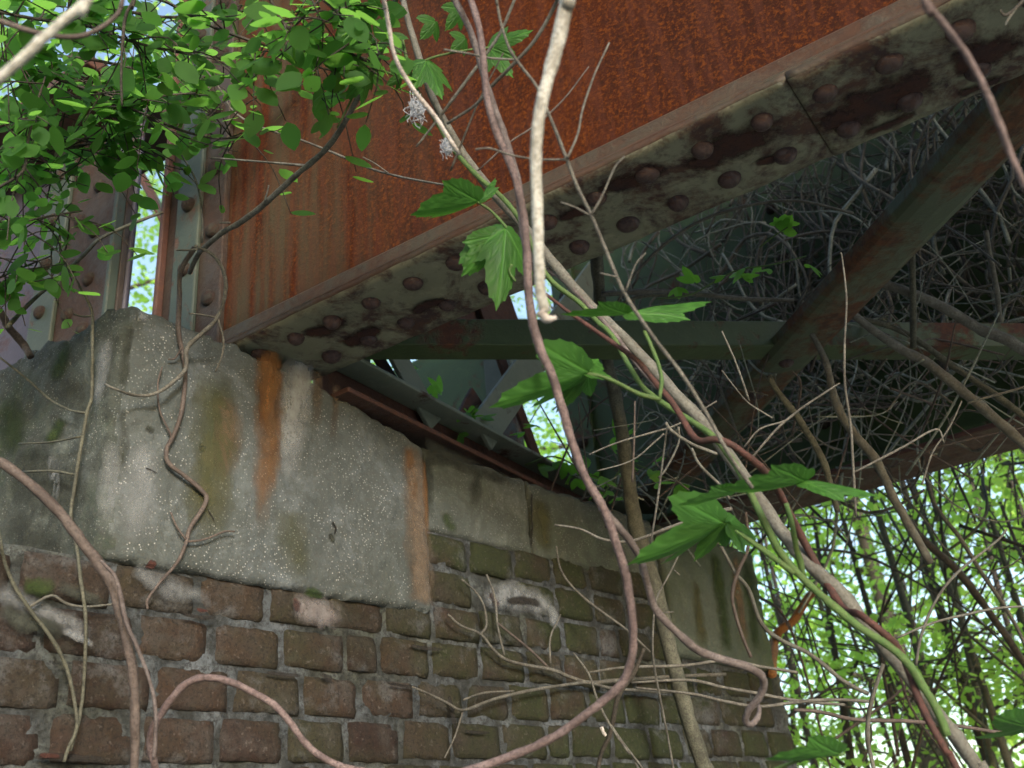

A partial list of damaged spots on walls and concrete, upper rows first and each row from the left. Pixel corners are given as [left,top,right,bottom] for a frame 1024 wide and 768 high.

corrosion [258,350,281,477]
corrosion [406,449,429,602]
leakage [294,587,338,626]